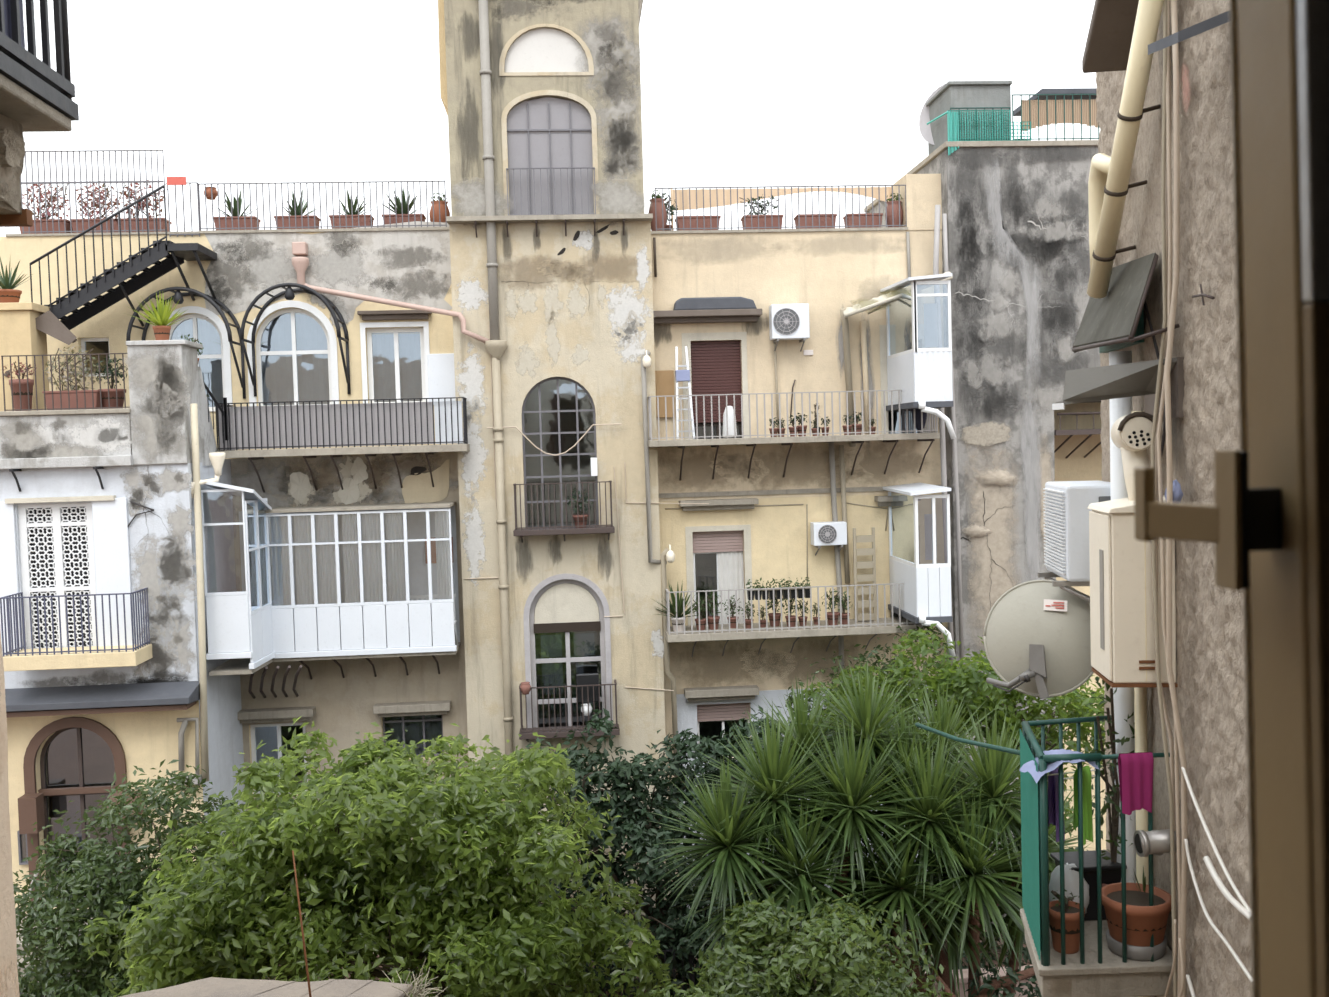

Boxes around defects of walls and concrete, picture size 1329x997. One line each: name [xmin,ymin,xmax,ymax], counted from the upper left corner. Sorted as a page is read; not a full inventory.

spalling [0,129,25,199]
damp [582,18,647,248]
damp [371,248,446,297]
peeling [606,247,651,363]
damp [0,422,100,458]
damp [126,350,190,461]
damp [950,146,1091,580]